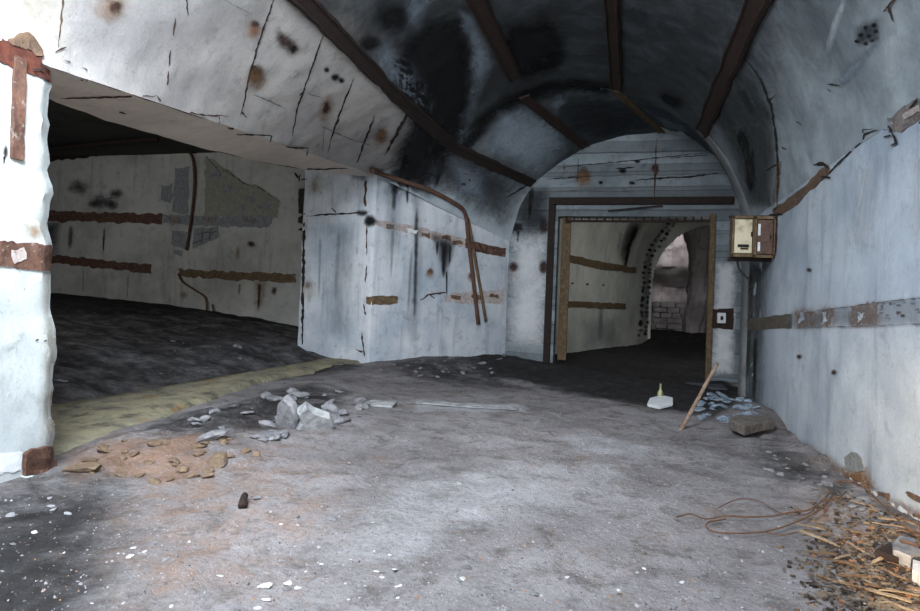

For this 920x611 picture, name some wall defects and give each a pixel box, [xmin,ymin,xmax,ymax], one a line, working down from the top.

crack [56,0,66,52]
crack [167,0,189,85]
crack [226,0,323,137]
leakage [378,48,434,113]
leakage [405,0,428,23]
leakage [458,16,489,142]
spalling [883,98,920,146]
spalling [161,156,281,257]
rust [0,231,152,274]
leakage [436,242,451,292]
spalling [796,297,920,327]